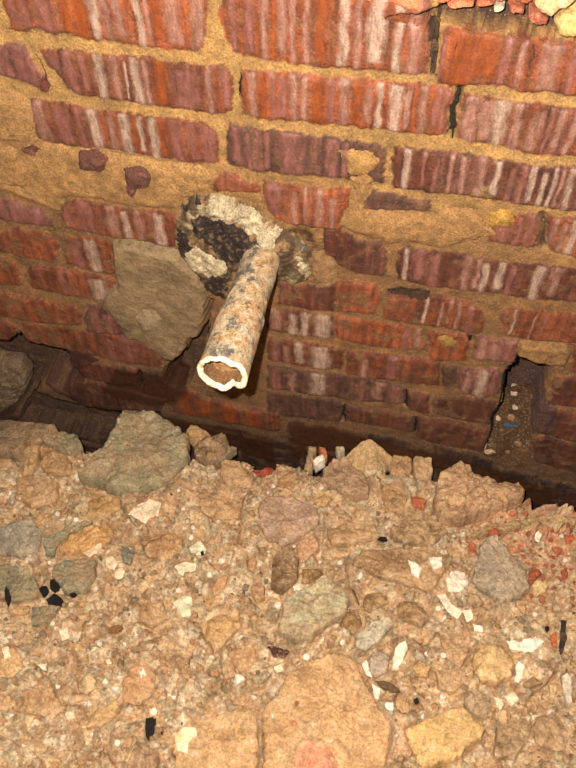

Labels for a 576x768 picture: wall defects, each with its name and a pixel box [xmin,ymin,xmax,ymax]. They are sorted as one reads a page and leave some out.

crack [449,86,461,138]